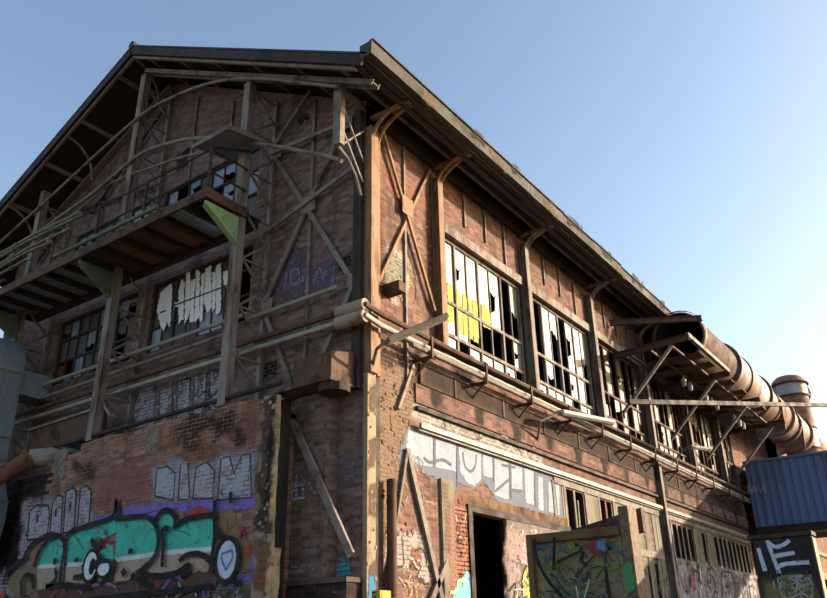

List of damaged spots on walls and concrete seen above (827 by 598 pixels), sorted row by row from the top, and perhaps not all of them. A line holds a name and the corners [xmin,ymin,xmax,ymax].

peeling [251,397,276,598]